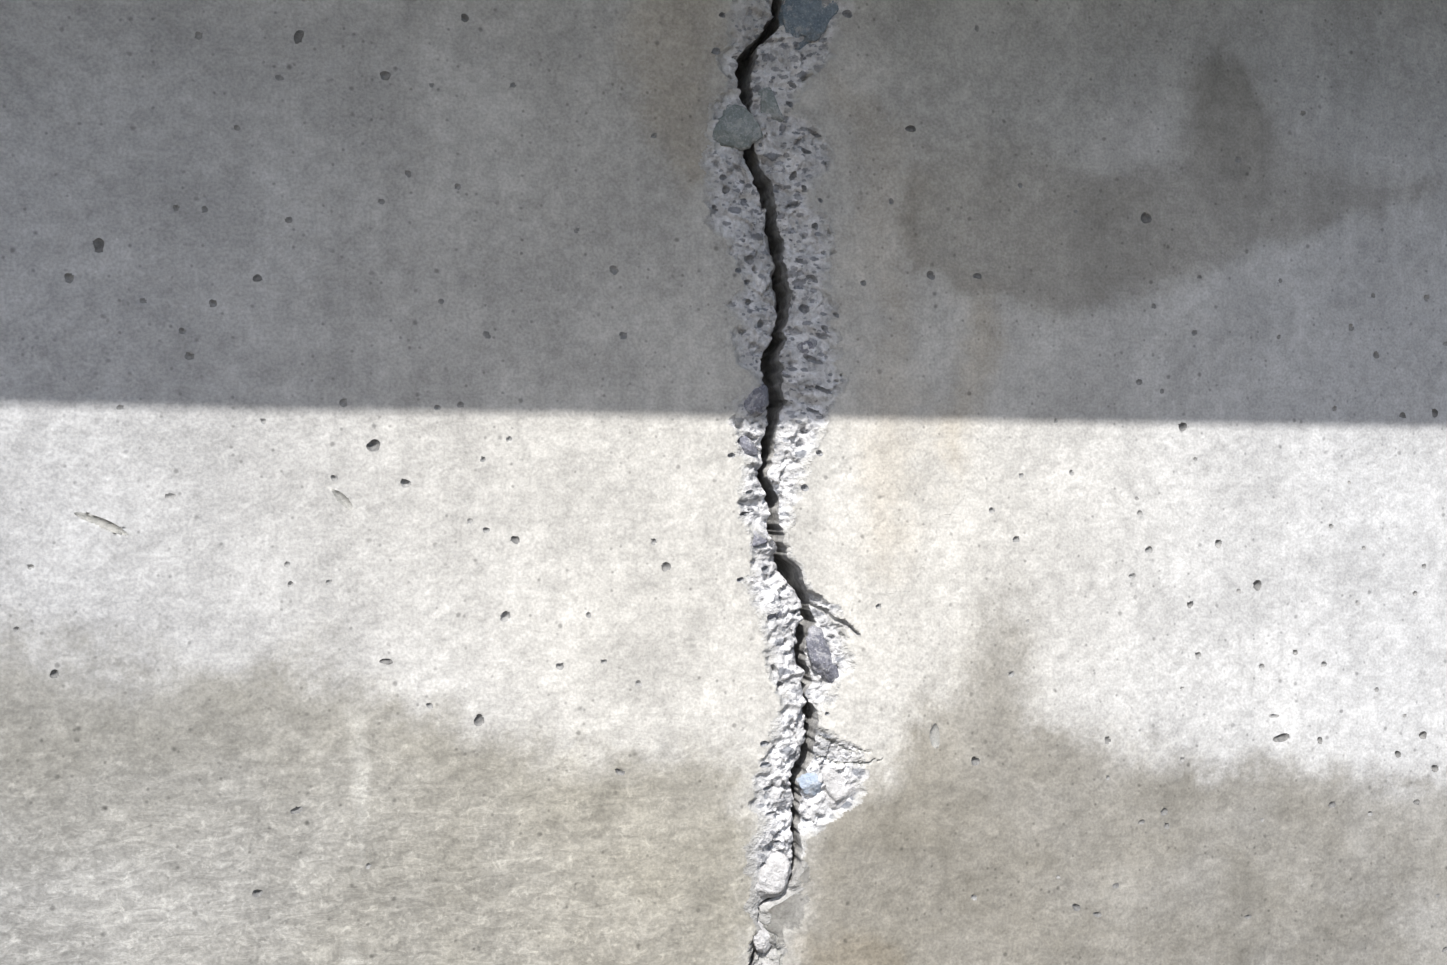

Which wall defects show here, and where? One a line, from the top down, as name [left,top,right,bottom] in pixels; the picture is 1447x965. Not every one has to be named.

leakage [0,560,1447,965]
spalling [698,0,870,965]
crack [735,0,882,965]
leakage [839,0,1447,330]